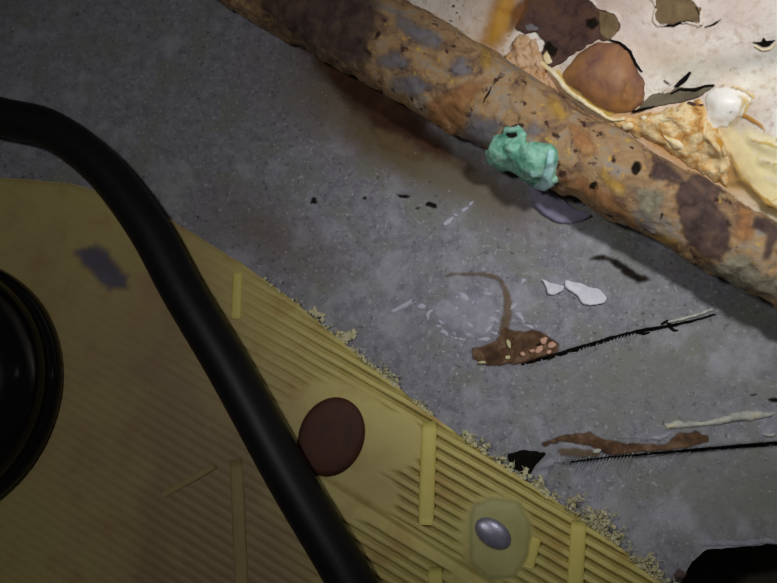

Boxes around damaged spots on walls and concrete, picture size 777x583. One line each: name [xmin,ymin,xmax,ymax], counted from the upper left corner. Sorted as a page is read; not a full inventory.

rust [261,0,482,158]
peeling [515,0,715,122]
peeling [753,38,777,51]
rust [482,0,777,261]
crack [521,308,716,365]
crack [554,441,777,463]
spalling [701,538,777,546]